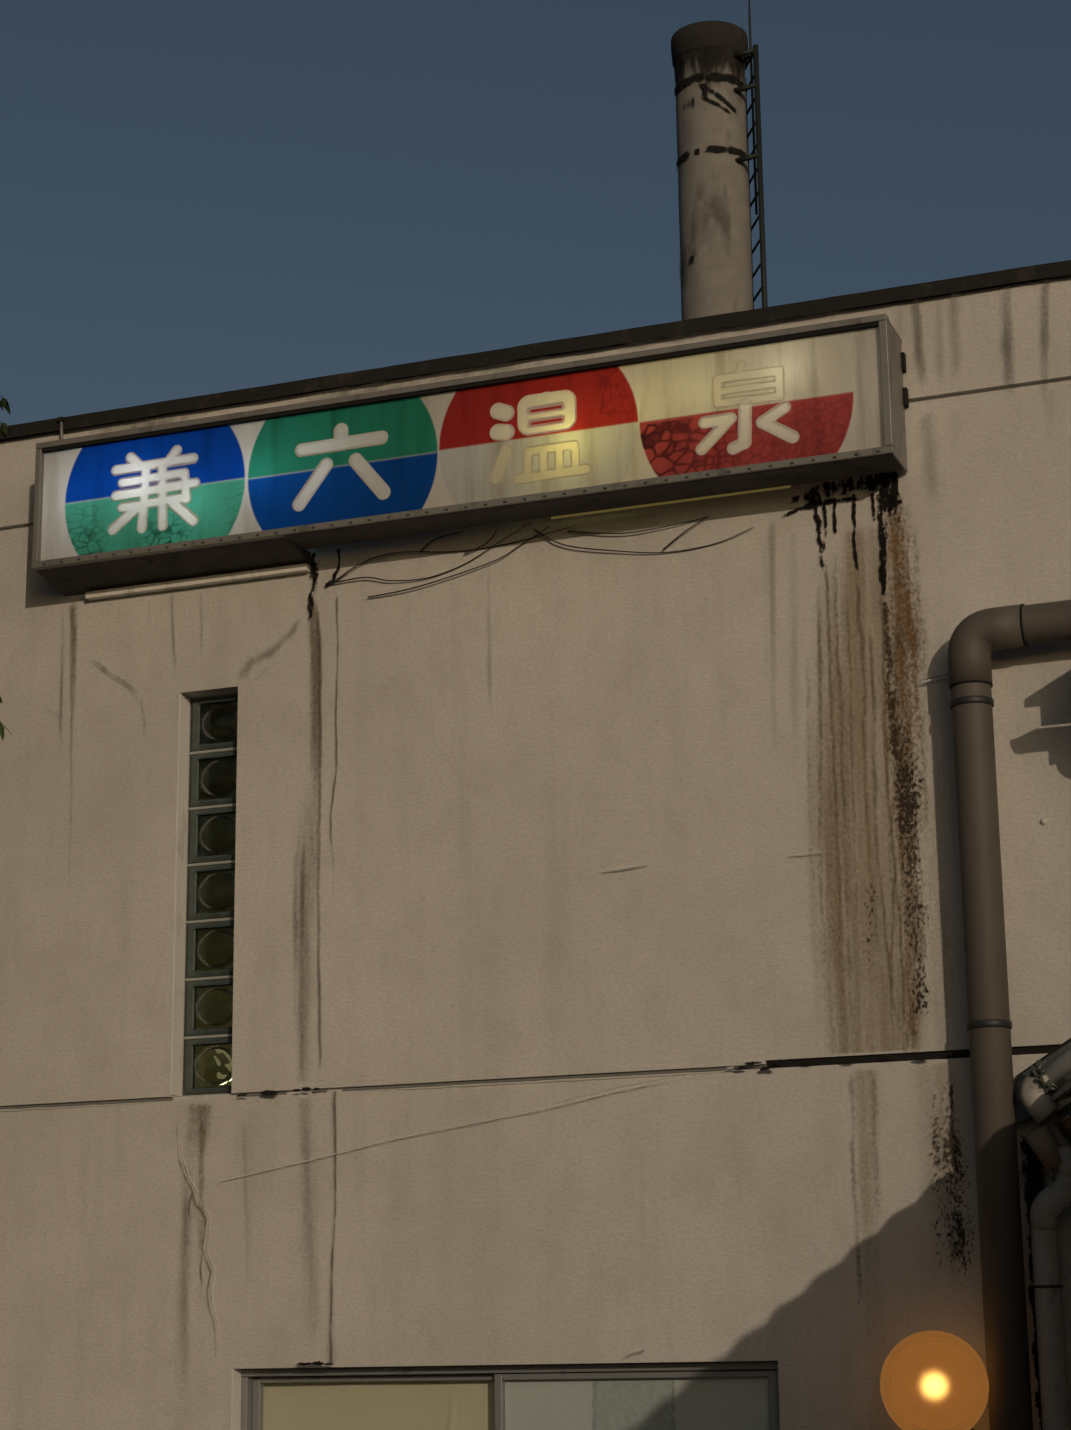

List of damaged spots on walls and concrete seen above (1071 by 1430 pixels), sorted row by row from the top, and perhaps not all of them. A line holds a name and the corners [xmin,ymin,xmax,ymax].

damp [307,548,340,764]
corrosion [826,506,930,1051]
crack [179,1067,737,1363]
damp [930,1085,976,1275]